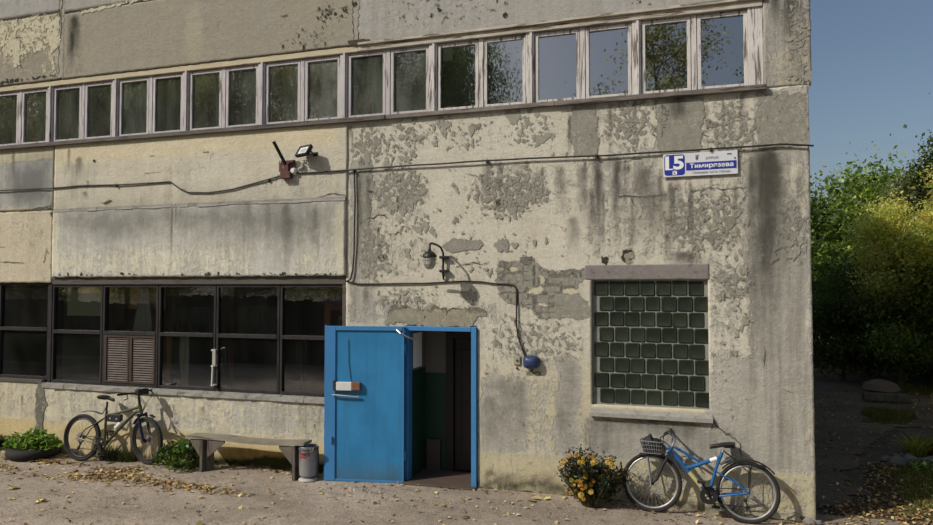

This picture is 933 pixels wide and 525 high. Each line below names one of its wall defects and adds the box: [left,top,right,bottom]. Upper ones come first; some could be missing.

peeling [0,0,65,85]
peeling [349,0,815,382]
damp [591,170,601,210]
damp [614,163,625,194]
damp [758,153,778,238]
crack [711,421,742,456]